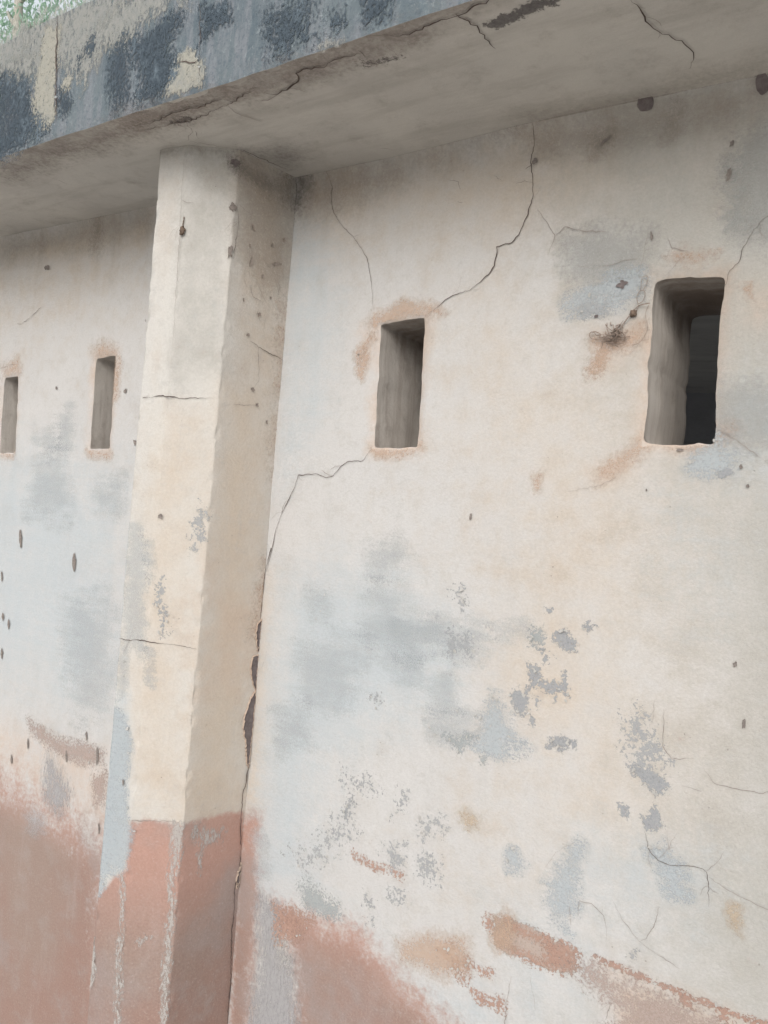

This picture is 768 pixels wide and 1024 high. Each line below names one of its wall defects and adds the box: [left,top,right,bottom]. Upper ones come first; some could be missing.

leakage [0,68,74,166]
leakage [75,32,97,75]
leakage [103,0,235,134]
crack [135,0,493,169]
leakage [255,0,396,66]
crack [631,1,694,68]
crack [429,124,605,313]
peeling [508,607,598,726]
crack [227,451,370,1024]
peeling [545,733,577,753]
peeling [612,699,675,832]
peeling [27,707,136,1024]